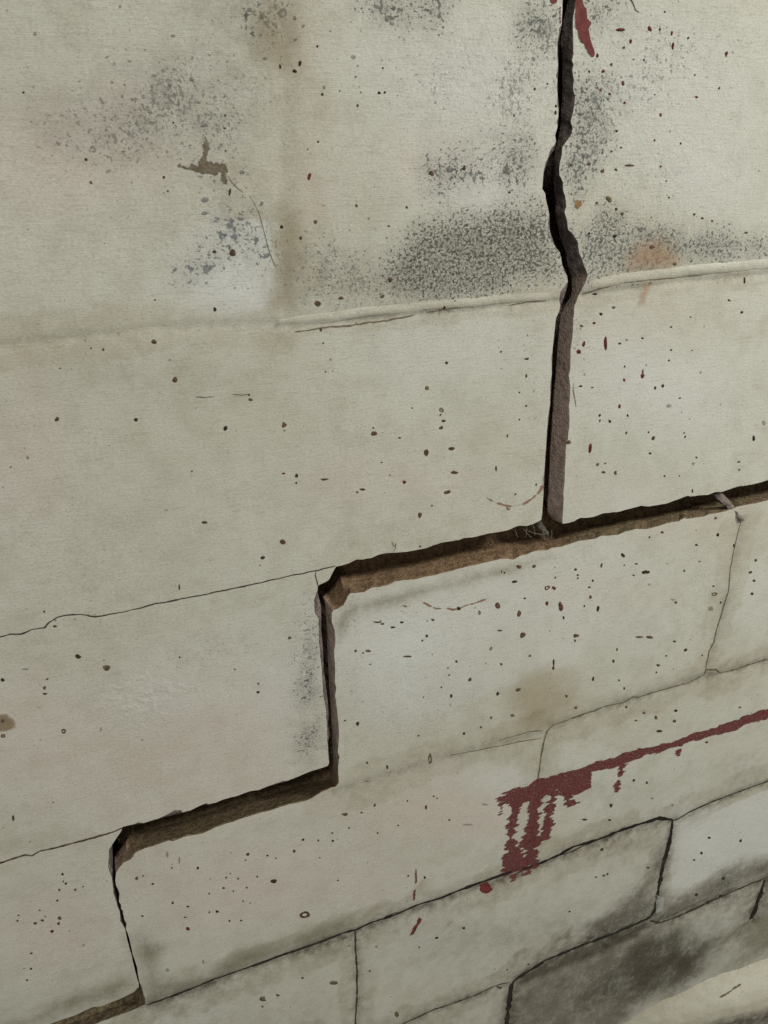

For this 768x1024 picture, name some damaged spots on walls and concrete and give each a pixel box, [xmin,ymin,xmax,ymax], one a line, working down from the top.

crack [228,177,276,266]
crack [295,307,462,332]
mould [376,132,566,313]
crack [538,0,768,550]
mould [560,69,768,292]
crack [0,566,335,637]
crack [452,523,768,778]
crack [0,828,122,864]
crack [51,524,547,1024]
crack [403,781,768,1024]
water stain [520,891,700,1024]